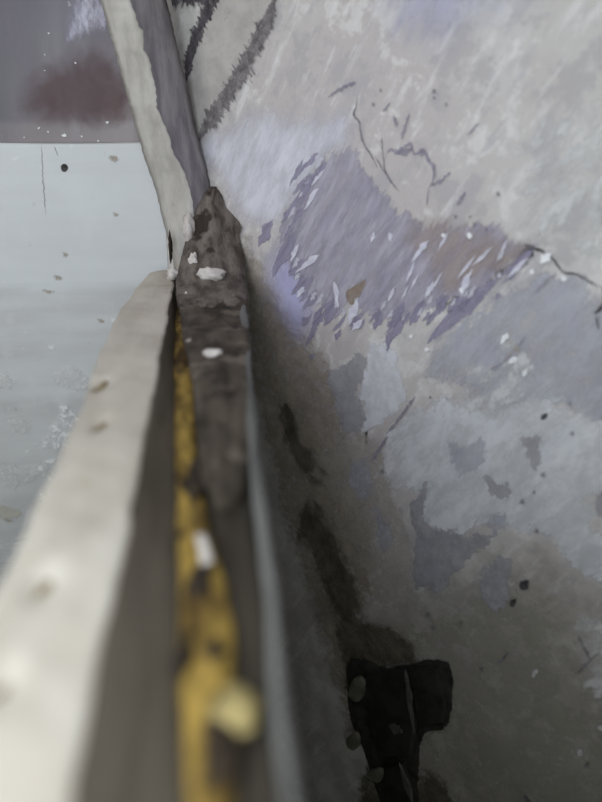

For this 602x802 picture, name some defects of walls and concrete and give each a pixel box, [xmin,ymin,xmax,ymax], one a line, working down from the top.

crack [353,96,450,205]
peeling [258,148,551,352]
crack [519,248,602,330]
peeling [327,353,367,433]
peeling [487,333,535,377]
spalling [280,404,325,485]
water stain [242,249,602,802]
peeling [410,481,498,593]
peeling [483,475,512,500]
peeling [520,435,545,477]